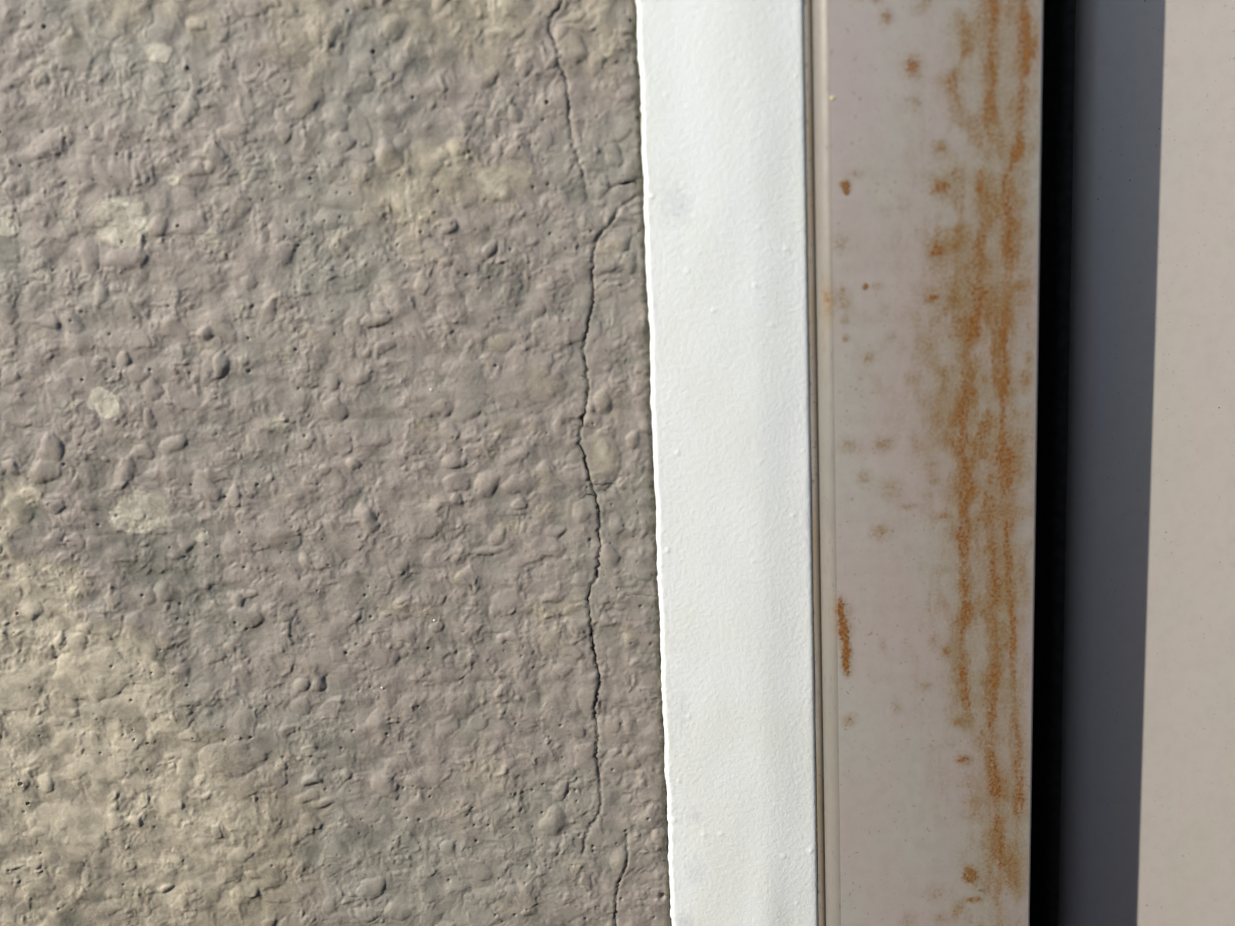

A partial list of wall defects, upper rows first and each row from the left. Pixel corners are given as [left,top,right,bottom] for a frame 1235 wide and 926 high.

crack [549,3,640,849]
crack [614,832,628,926]
corrosion [835,597,851,676]
corrosion [926,0,1038,912]